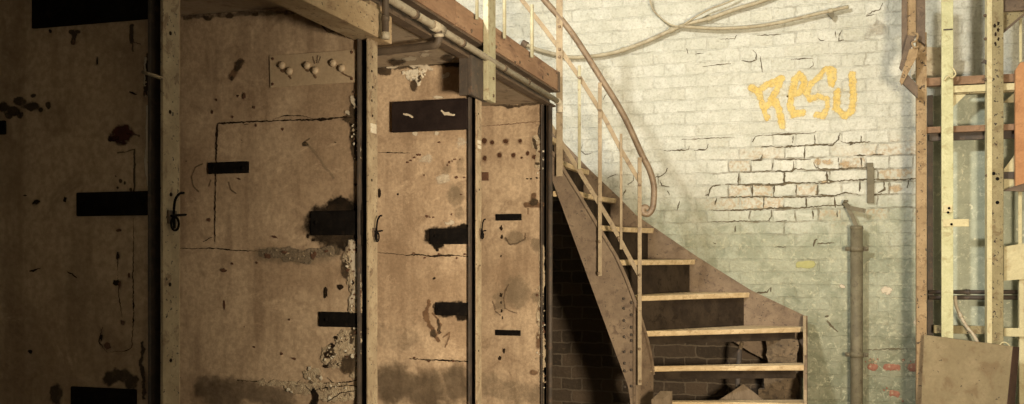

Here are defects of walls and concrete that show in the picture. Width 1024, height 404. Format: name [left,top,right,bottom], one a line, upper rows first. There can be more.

peeling [387,44,453,91]
spalling [256,234,362,313]
peeling [257,326,362,404]
damp [377,366,467,404]